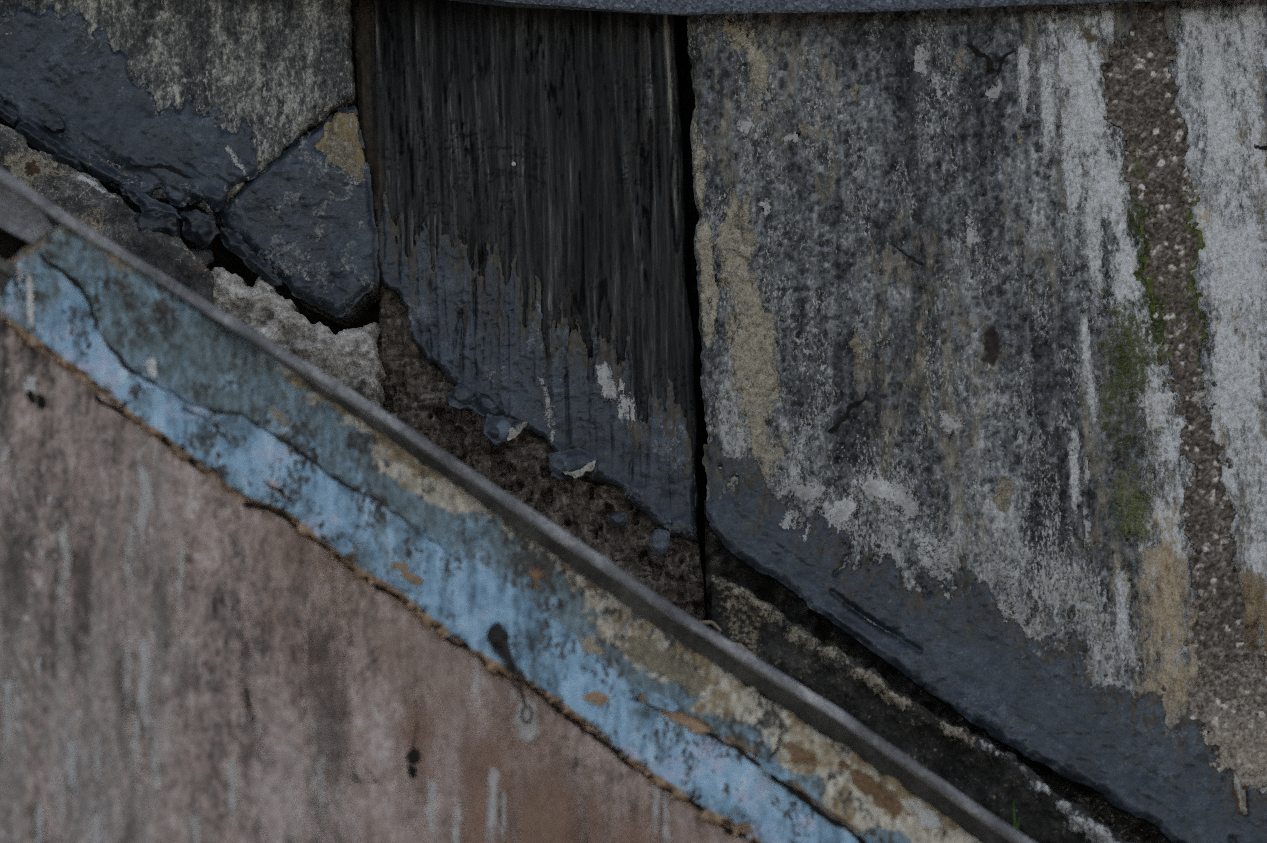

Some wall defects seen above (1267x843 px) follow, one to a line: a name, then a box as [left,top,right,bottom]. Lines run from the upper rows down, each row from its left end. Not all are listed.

flaking render [914,44,948,102]
crack [40,253,446,551]
flaking render [693,122,958,582]
crack [827,392,867,433]
water stain [981,326,1002,366]
water stain [1017,0,1267,678]
flaking render [1101,1,1267,818]
crack [240,481,756,843]
flaking render [714,579,911,710]
crack [704,731,867,843]
peeling [839,760,944,831]
flaking render [1022,767,1117,843]